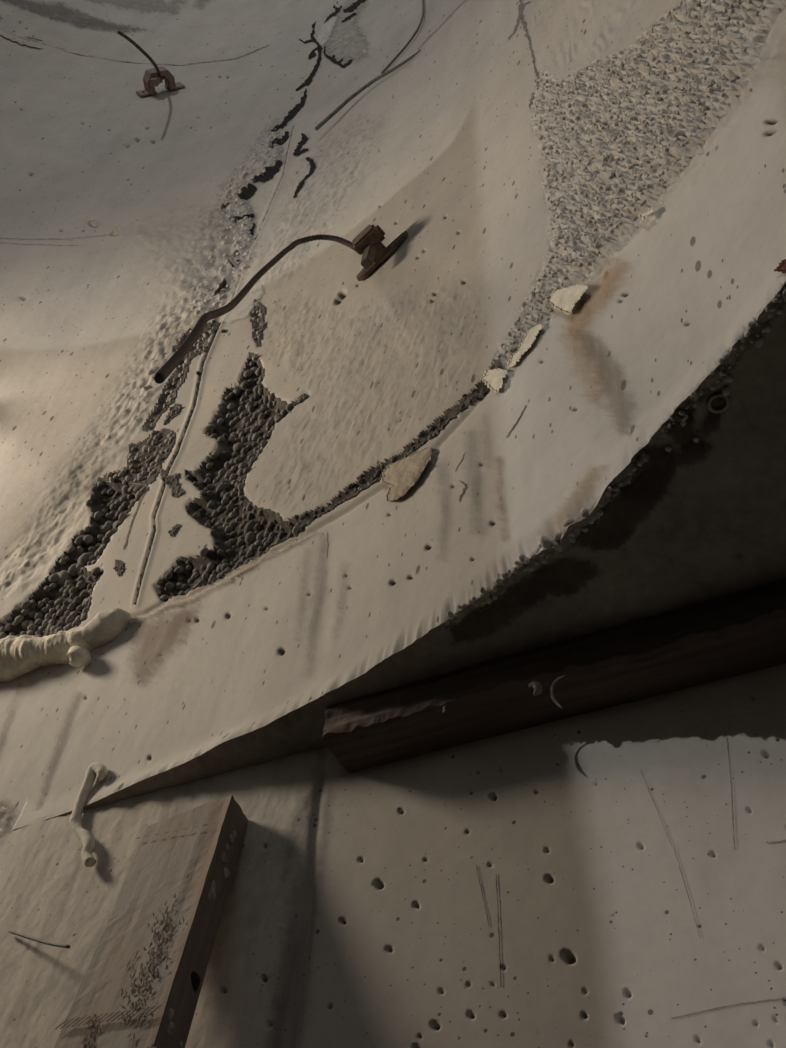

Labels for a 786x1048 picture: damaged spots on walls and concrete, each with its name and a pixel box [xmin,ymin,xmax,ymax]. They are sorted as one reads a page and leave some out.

spalling [489,0,785,370]
spalling [0,124,486,639]
crack [123,0,365,605]
spalling [659,284,786,452]
leakage [451,559,598,641]
spalling [443,451,650,631]
leakage [575,408,721,550]